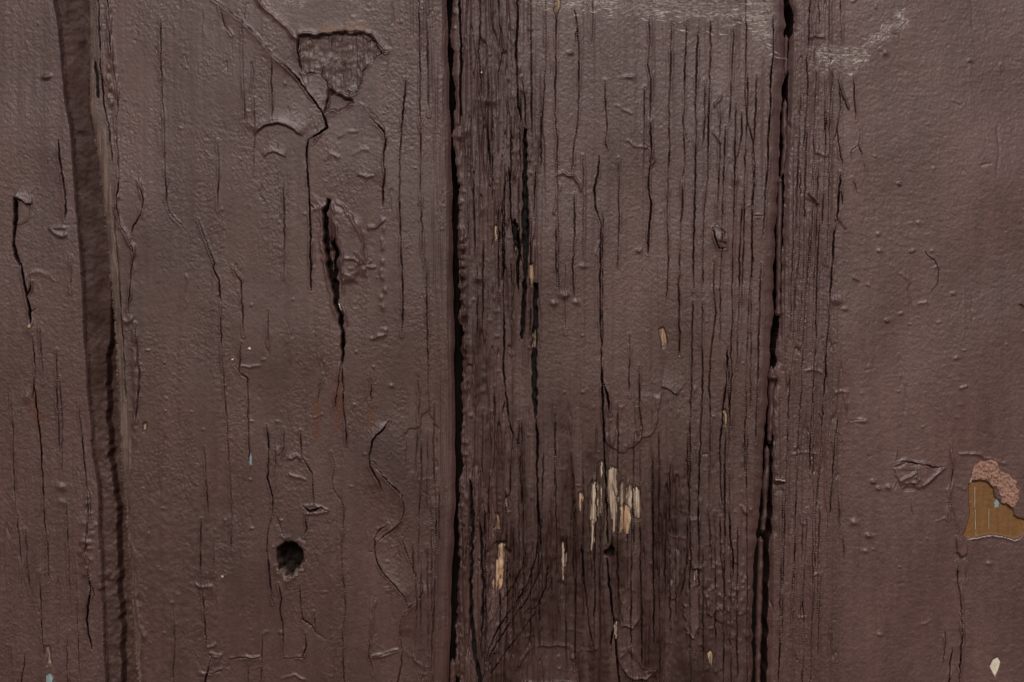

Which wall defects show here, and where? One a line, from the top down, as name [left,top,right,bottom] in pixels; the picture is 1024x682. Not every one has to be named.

peeling [297,24,385,95]
crack [200,0,440,682]
crack [458,0,774,682]
peeling [492,543,507,601]
peeling [538,388,679,551]
peeling [963,460,1024,541]